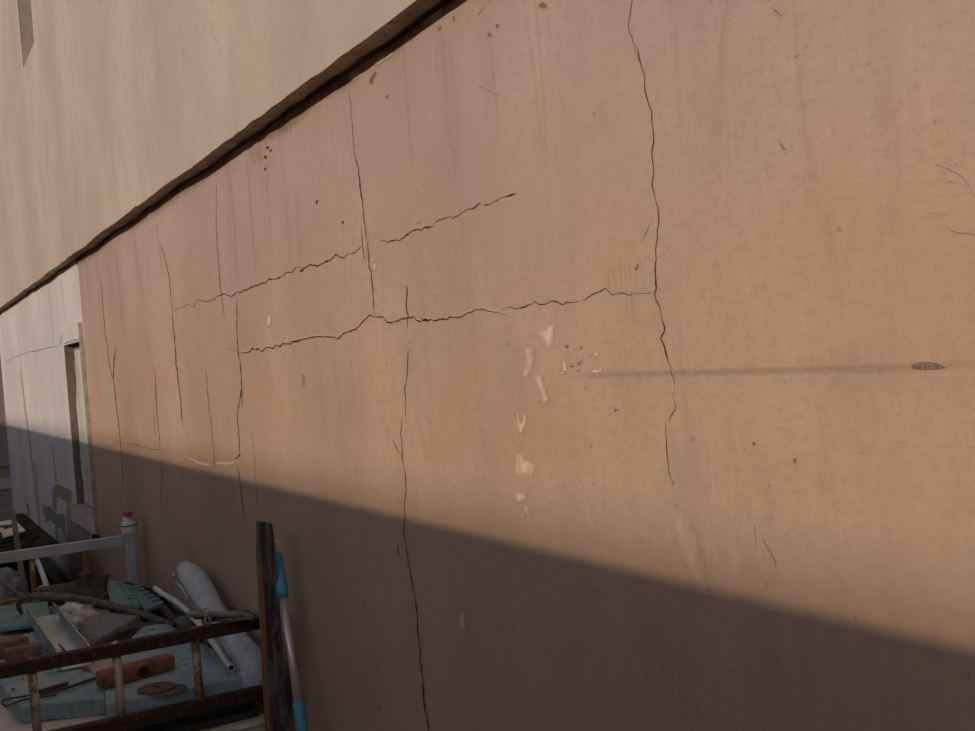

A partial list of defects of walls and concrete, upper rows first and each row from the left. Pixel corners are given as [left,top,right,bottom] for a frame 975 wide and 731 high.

crack [10,0,678,515]
crack [394,355,430,731]